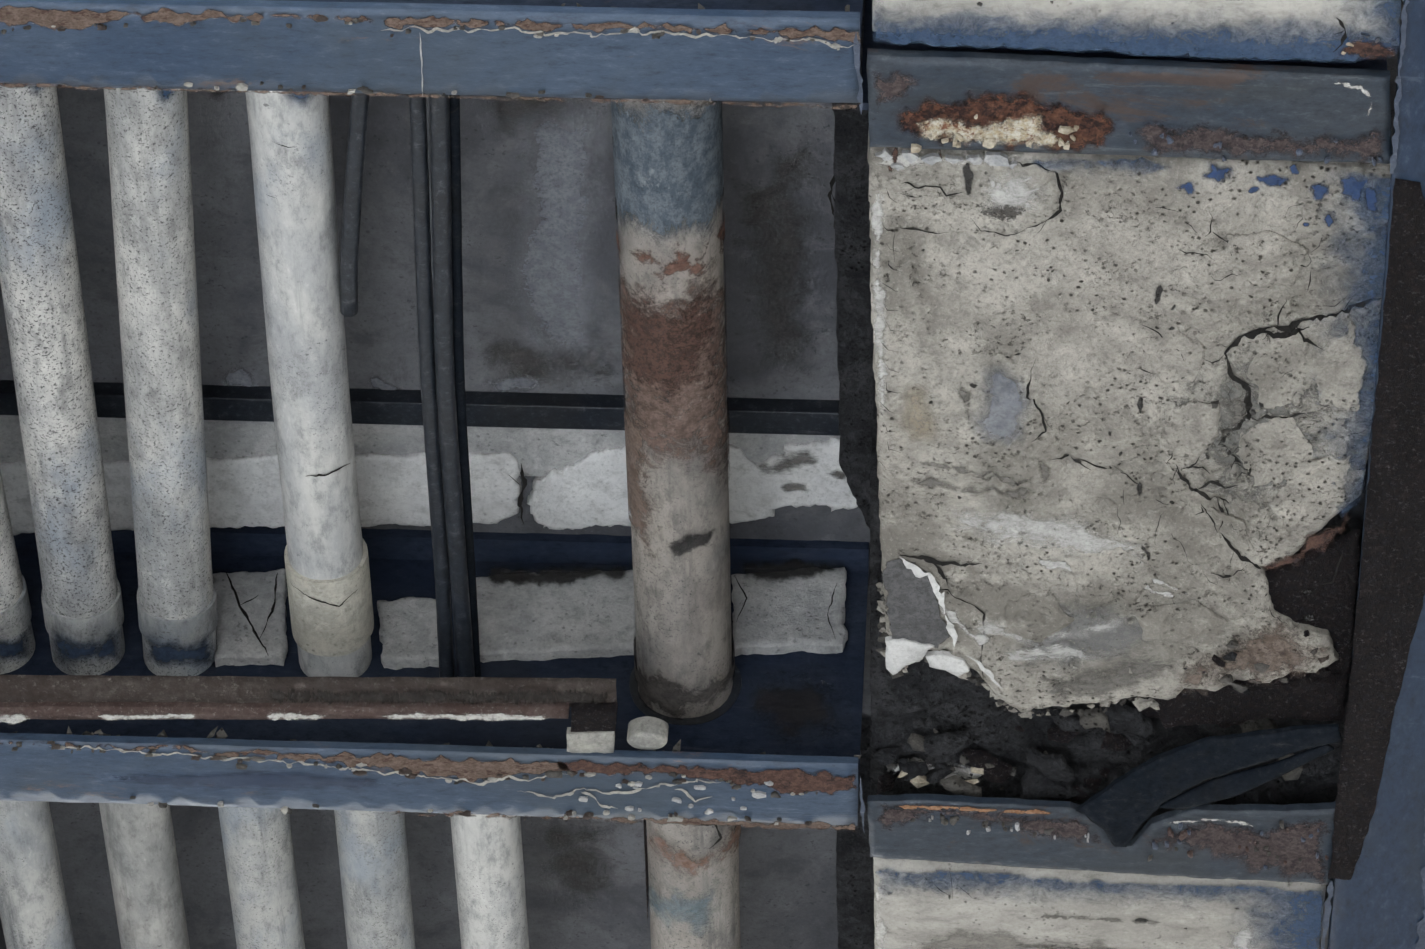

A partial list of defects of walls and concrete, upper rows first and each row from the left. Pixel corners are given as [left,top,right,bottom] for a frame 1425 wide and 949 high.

rust [0,5,861,50]
rust [585,71,1385,166]
spalling [875,147,1017,203]
spalling [1183,203,1309,289]
rust [615,205,729,558]
crack [1026,205,1381,584]
crack [226,572,278,656]
crack [900,555,985,674]
spalling [869,223,1250,805]
spalling [1140,319,1368,805]
rust [0,741,857,798]
rust [395,809,856,921]